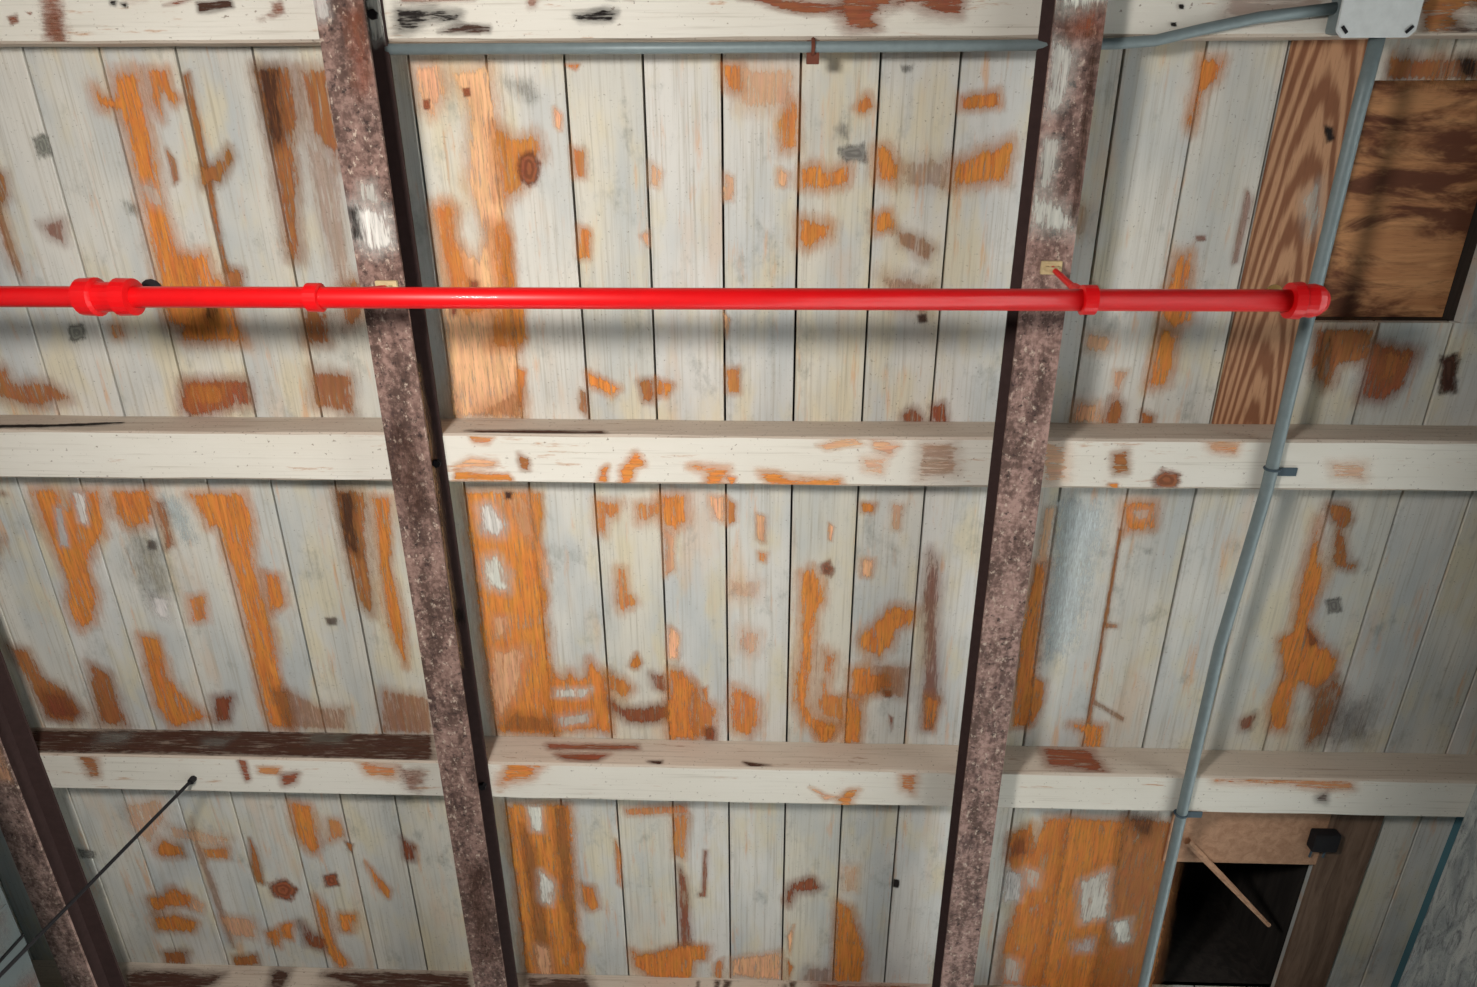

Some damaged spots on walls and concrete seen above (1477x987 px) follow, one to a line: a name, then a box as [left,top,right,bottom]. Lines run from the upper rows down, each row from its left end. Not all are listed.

peeling [96,69,243,287]
peeling [254,66,339,261]
rust [349,208,361,238]
peeling [396,10,490,33]
peeling [416,64,540,287]
peeling [754,0,964,29]
rust [1066,5,1103,221]
peeling [443,309,760,764]
peeling [7,489,432,785]
peeling [793,552,941,744]
peeling [506,804,598,987]
peeling [1001,816,1171,987]